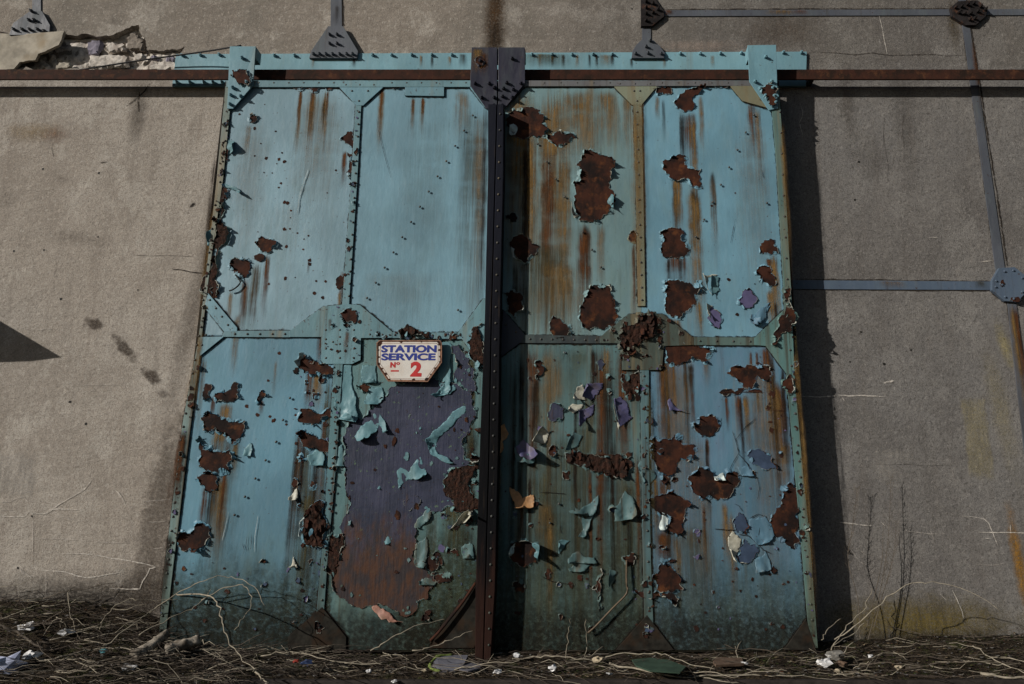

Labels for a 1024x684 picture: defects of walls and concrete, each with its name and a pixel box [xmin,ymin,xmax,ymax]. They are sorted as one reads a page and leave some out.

spalling [0,29,181,69]
rust [507,94,641,212]
rust [748,105,760,142]
peeling [286,271,484,625]
rust [511,311,669,591]
peeling [500,82,812,638]
rust [750,333,811,532]
rust [1002,311,1024,375]